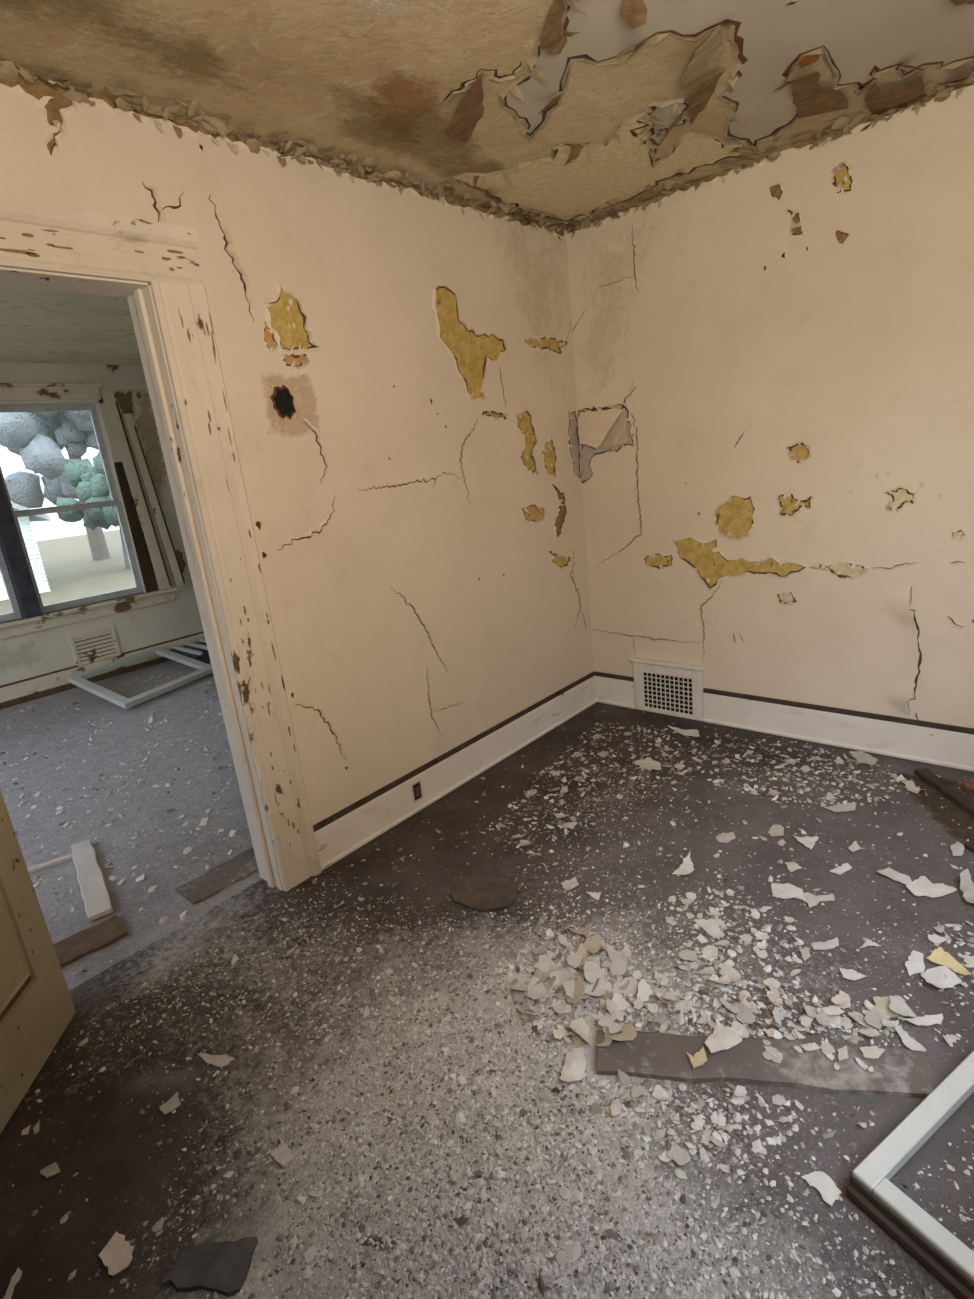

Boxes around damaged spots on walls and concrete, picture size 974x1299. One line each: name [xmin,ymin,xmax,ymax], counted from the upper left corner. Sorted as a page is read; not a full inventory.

peeling [0,0,974,240]
peeling [259,279,322,371]
spalling [270,385,296,420]
crack [276,366,507,550]
peeling [431,281,635,571]
peeling [642,491,871,606]
crack [292,700,348,759]
crack [390,584,463,736]